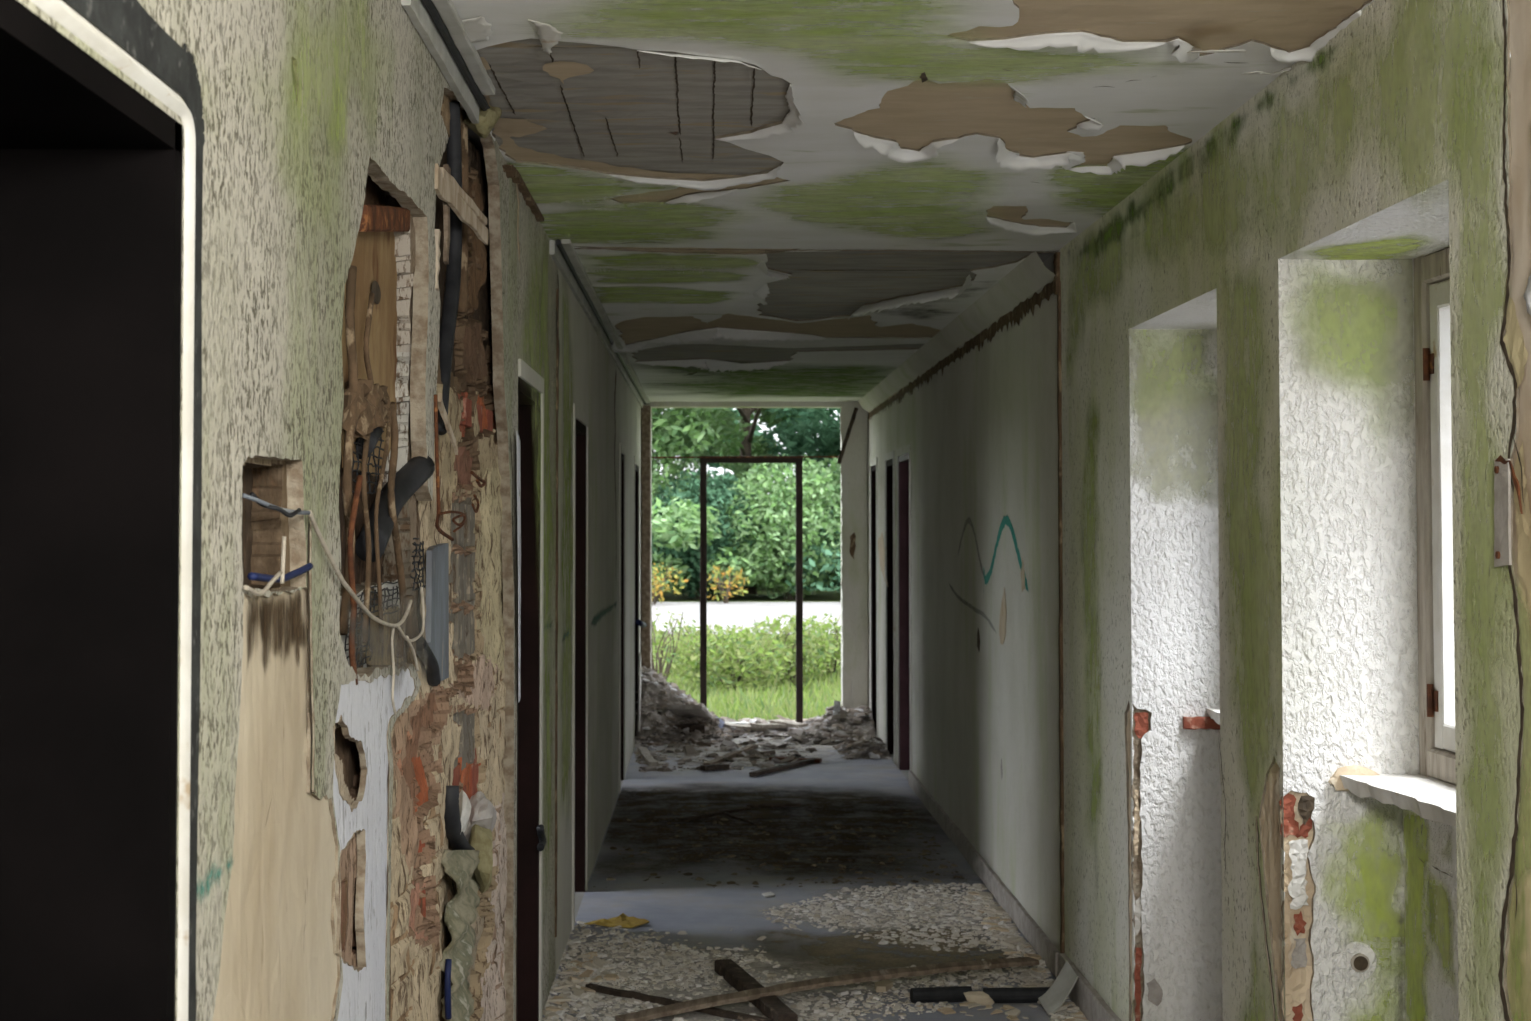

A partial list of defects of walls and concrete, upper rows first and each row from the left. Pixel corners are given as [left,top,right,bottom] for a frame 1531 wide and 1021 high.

peeling [462,16,804,204]
peeling [836,77,1192,175]
peeling [949,0,1369,75]
peeling [600,206,1078,375]
crack [1500,0,1525,507]
water stain [248,596,306,670]
peeling [213,175,420,1021]
spalling [1126,704,1162,1021]
flaking render [1183,716,1220,730]
spalling [1261,762,1315,1021]
spalling [1328,765,1380,791]
crack [1498,565,1524,1021]